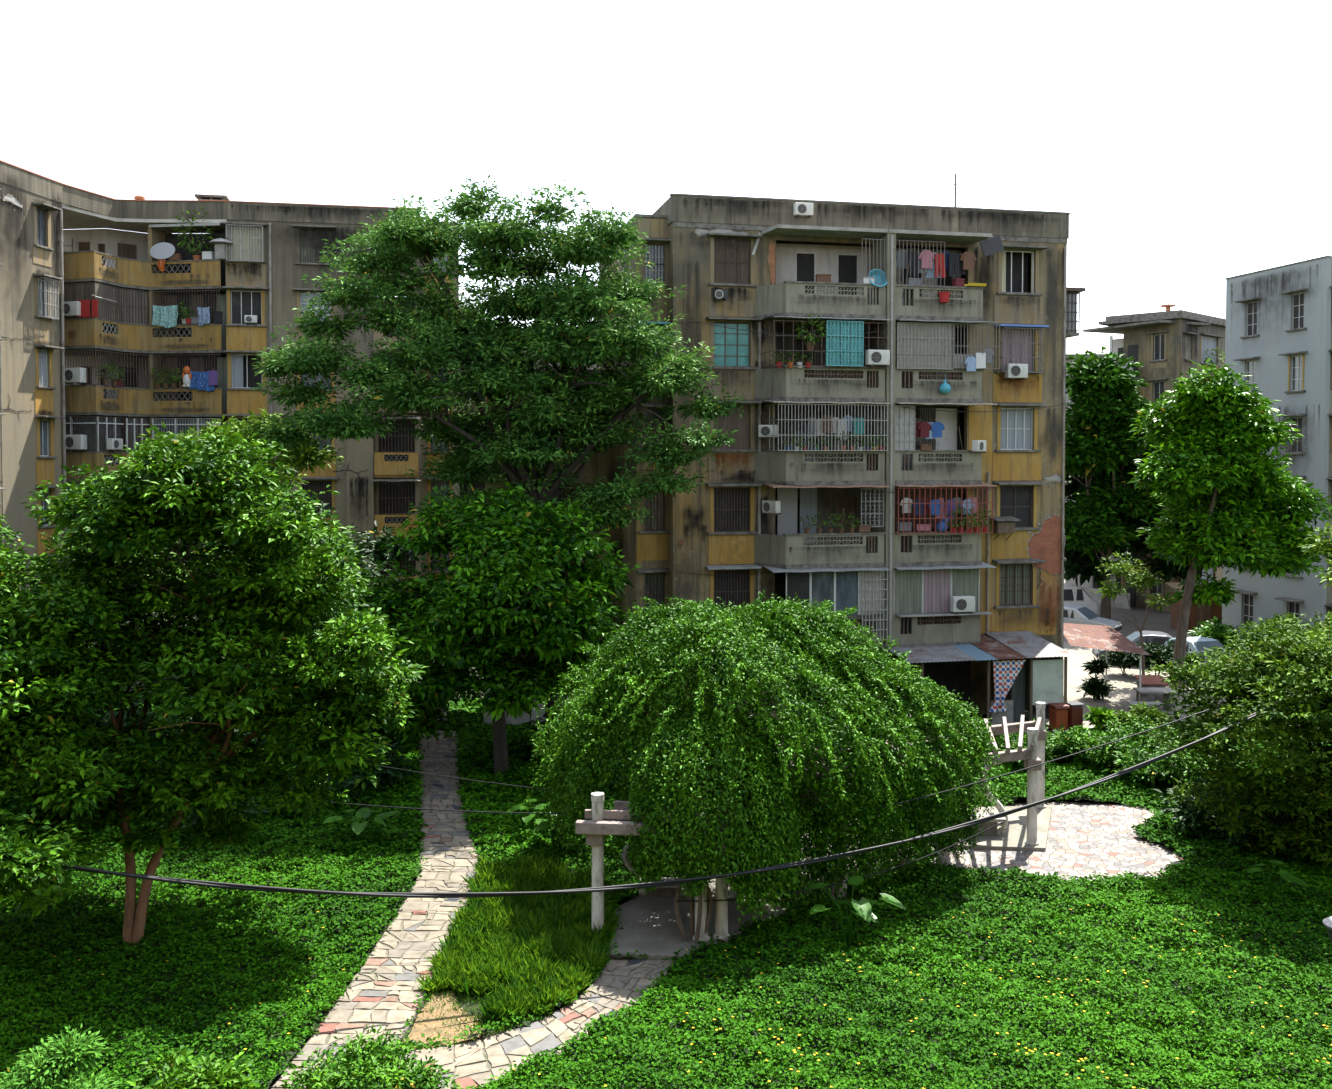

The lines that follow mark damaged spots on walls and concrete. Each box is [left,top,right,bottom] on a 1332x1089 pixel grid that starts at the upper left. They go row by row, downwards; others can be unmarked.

spalling [1025,514,1066,577]